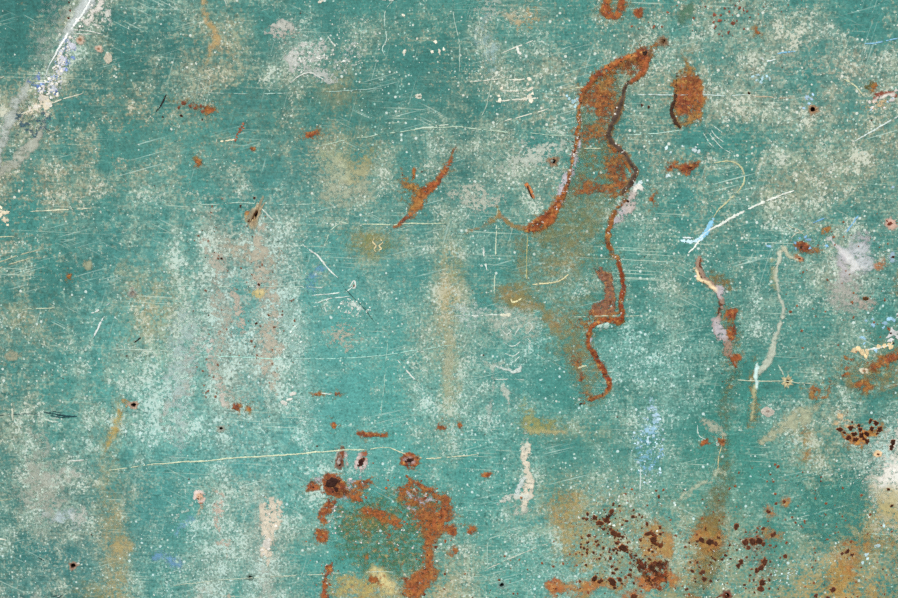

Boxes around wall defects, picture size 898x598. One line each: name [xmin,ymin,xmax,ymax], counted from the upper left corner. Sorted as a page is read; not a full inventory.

corrosion [594,0,663,29]
corrosion [692,0,766,37]
corrosion [669,59,707,128]
corrosion [393,148,455,228]
corrosion [493,46,655,405]
corrosion [842,349,898,394]
corrosion [834,410,884,449]
corrosion [305,475,477,598]
corrosion [541,463,806,598]
corrosion [804,513,894,598]